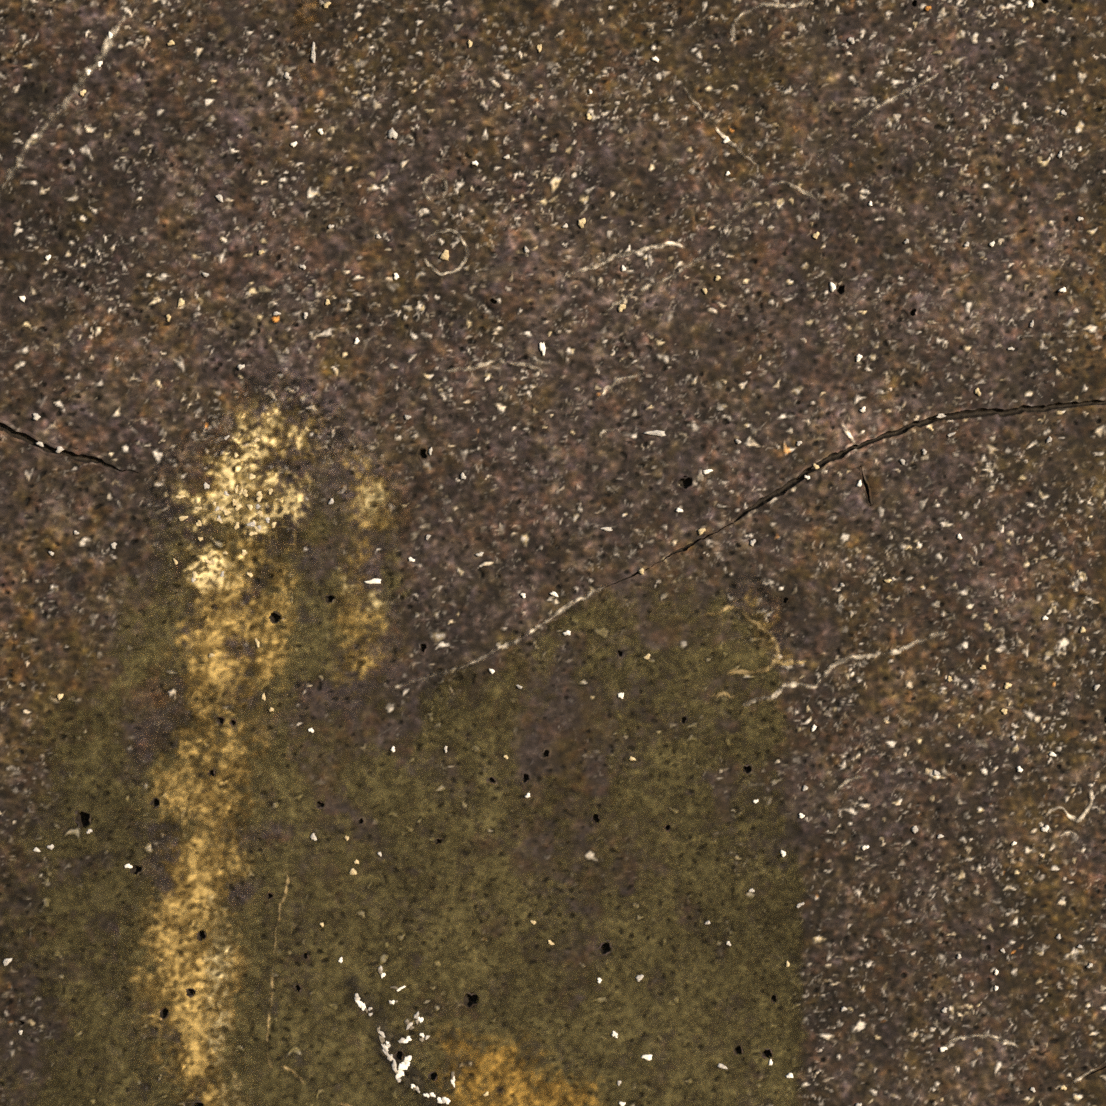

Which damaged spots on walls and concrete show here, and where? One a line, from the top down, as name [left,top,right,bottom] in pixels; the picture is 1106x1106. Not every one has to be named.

crack [0,419,140,477]
leakage [356,484,386,528]
crack [472,396,1106,663]
leakage [337,576,385,636]
leakage [347,652,373,670]
crack [707,605,945,705]
leakage [145,408,307,1106]